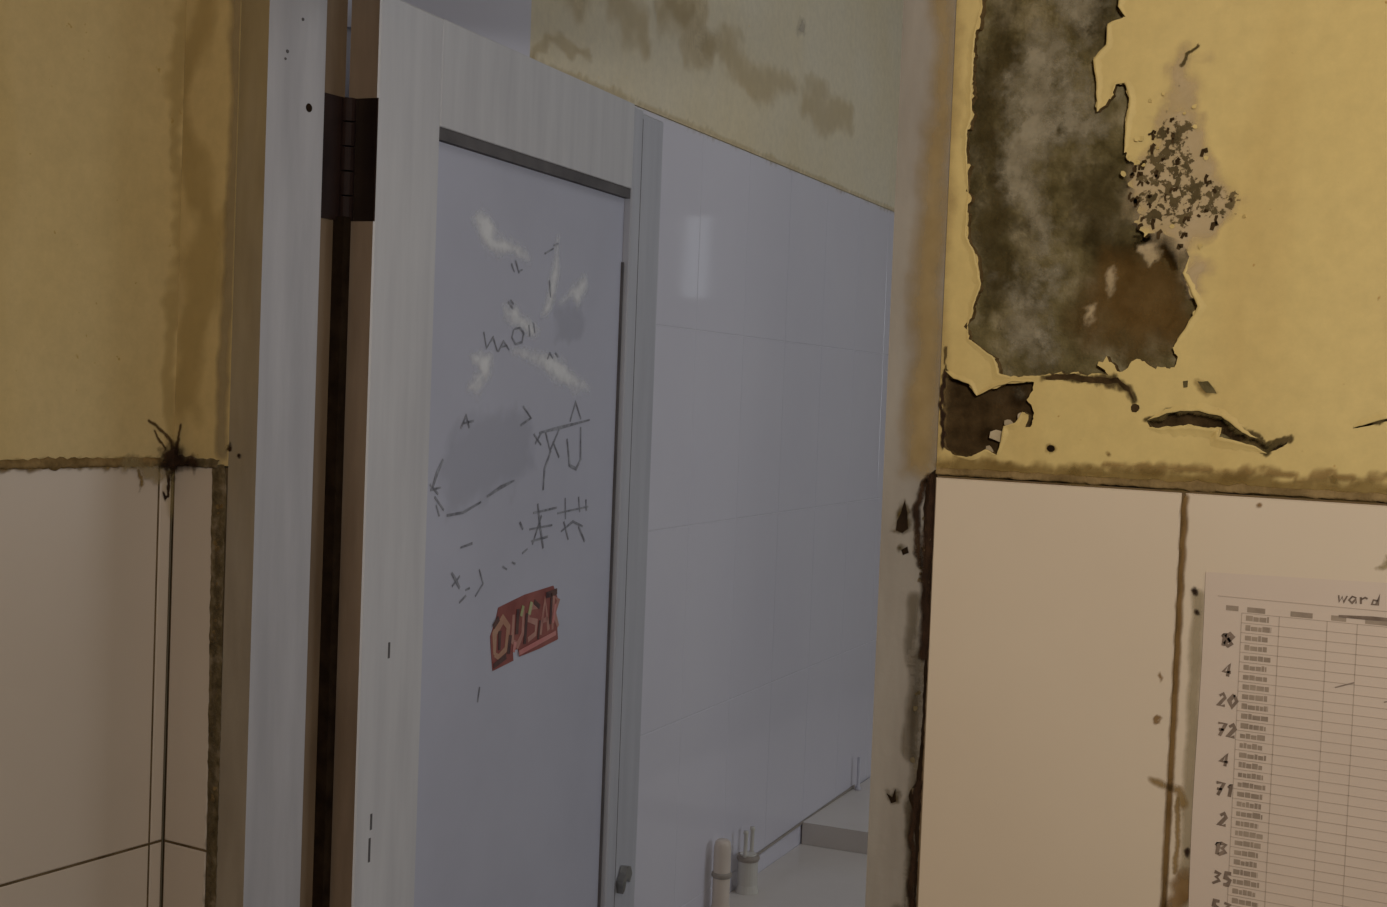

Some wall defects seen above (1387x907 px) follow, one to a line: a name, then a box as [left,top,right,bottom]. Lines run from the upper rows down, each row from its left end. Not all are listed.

spalling [938,0,1246,462]
crack [1041,373,1293,456]
crack [1353,408,1387,428]
leakage [912,453,1387,907]
leakage [907,779,922,907]